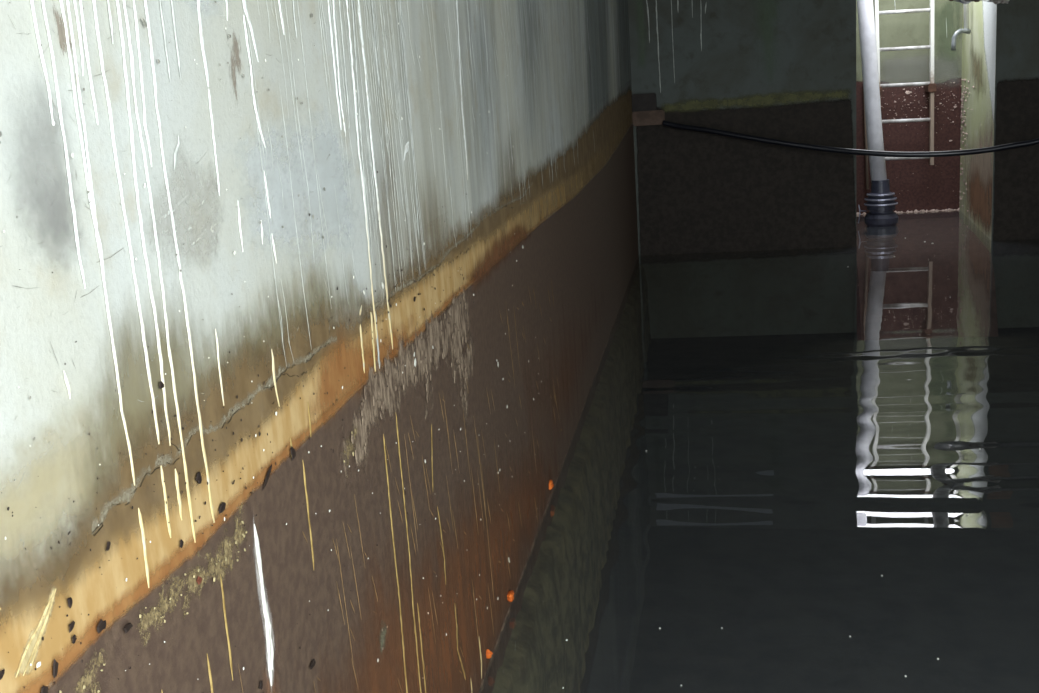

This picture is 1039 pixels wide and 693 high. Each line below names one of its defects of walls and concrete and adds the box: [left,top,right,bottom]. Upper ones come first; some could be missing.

crack [91,338,336,536]
damp [0,0,440,559]
rust [0,89,633,693]
damp [48,81,871,693]
damp [426,0,632,246]